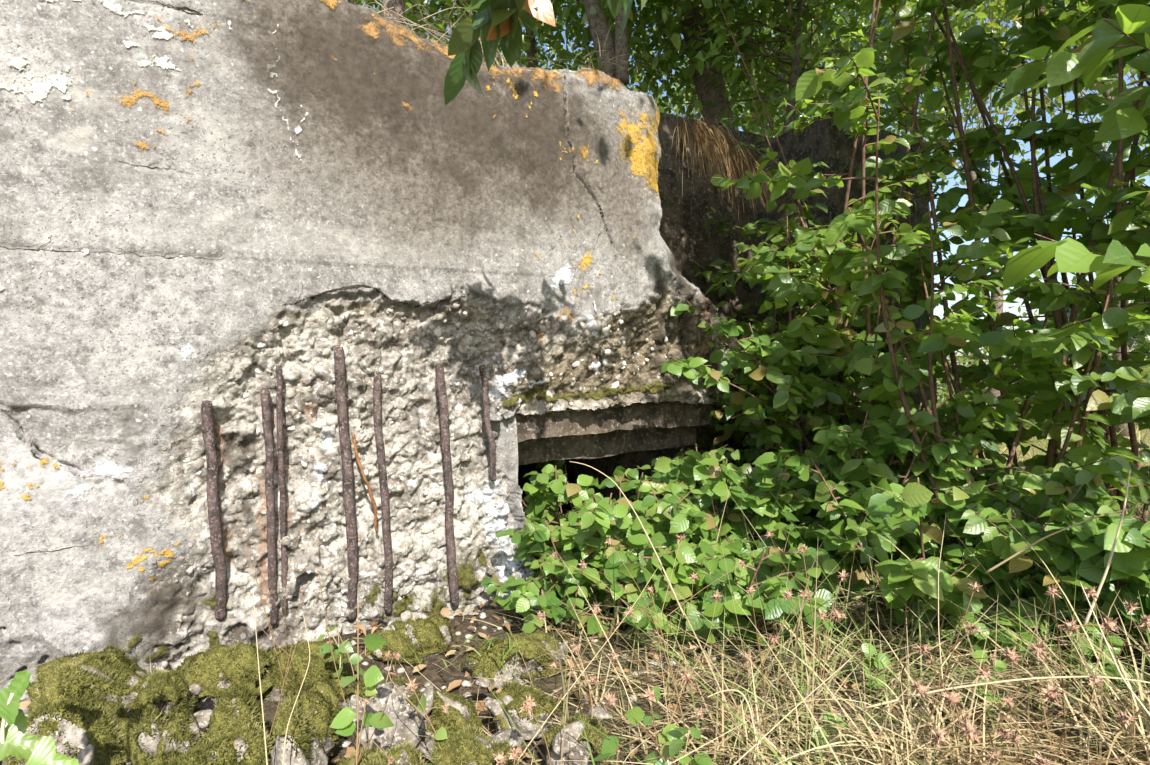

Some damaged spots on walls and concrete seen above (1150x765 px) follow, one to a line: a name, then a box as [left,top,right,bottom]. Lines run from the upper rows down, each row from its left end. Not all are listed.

crack [133,0,203,15]
peeling [551,263,574,288]
crack [556,83,621,247]
crack [0,409,84,479]
corrosion [201,400,227,621]
corrosion [260,365,288,625]
corrosion [334,347,393,621]
spalling [0,271,729,675]